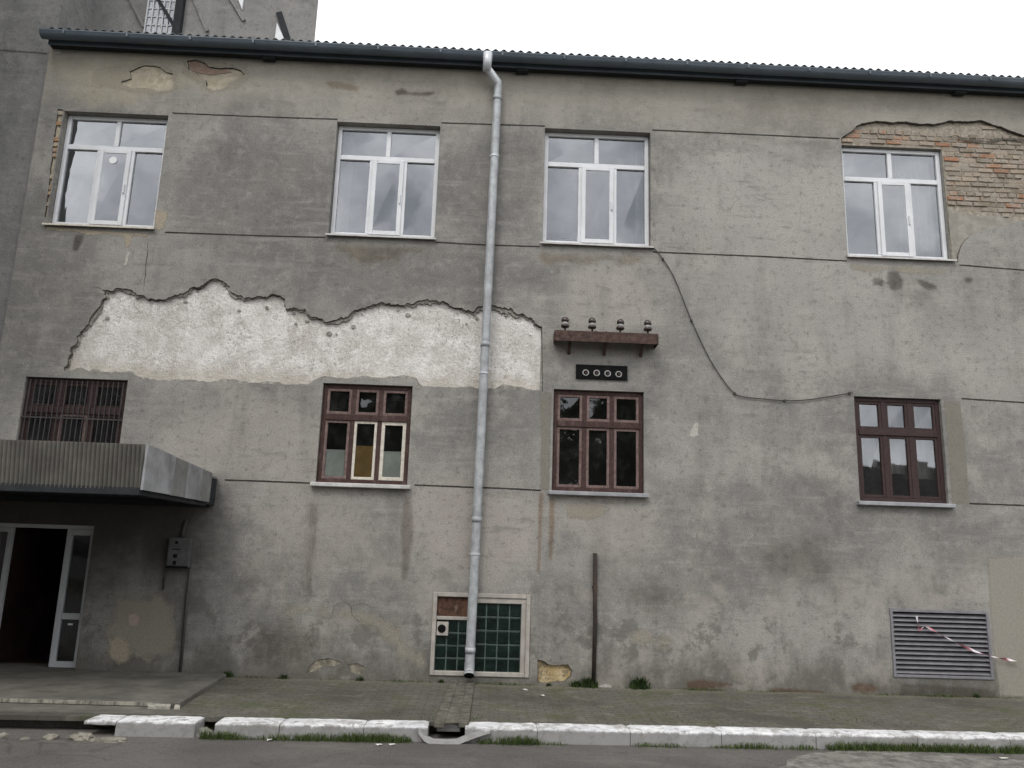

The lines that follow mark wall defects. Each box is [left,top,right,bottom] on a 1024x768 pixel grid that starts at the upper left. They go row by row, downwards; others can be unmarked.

spalling [93,59,248,94]
spalling [44,109,63,218]
flaking render [841,120,1024,263]
spalling [64,278,543,391]
spalling [537,660,572,684]